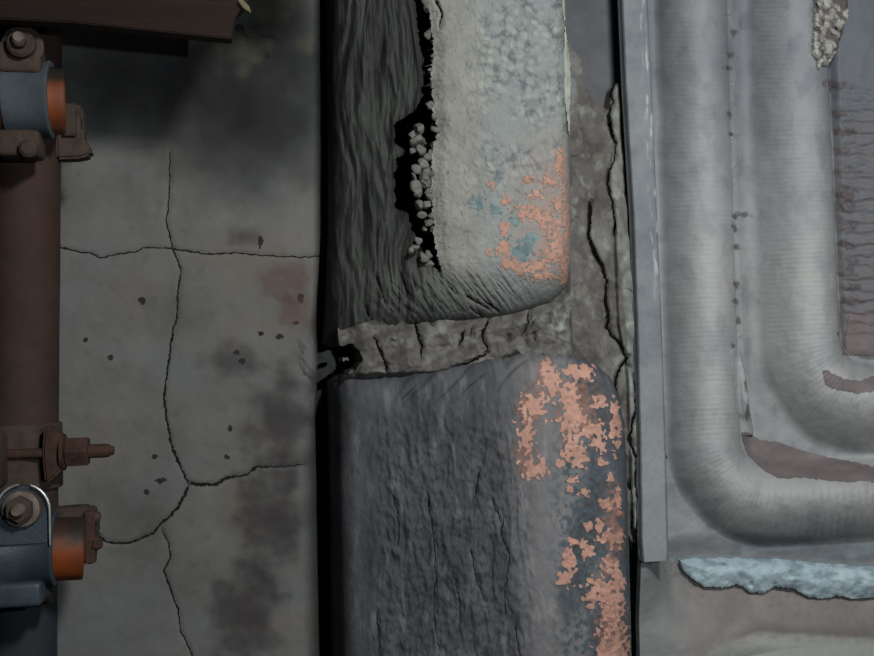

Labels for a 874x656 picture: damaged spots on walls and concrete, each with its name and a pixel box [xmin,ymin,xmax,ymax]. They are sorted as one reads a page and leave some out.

spalling [811,0,849,70]
spalling [408,101,442,267]
crack [60,151,322,656]
crack [365,275,395,373]
crack [400,271,417,297]
crack [414,324,434,358]
crack [448,285,536,367]
crack [587,83,638,550]
peeling [823,370,874,394]
peeling [741,431,874,483]